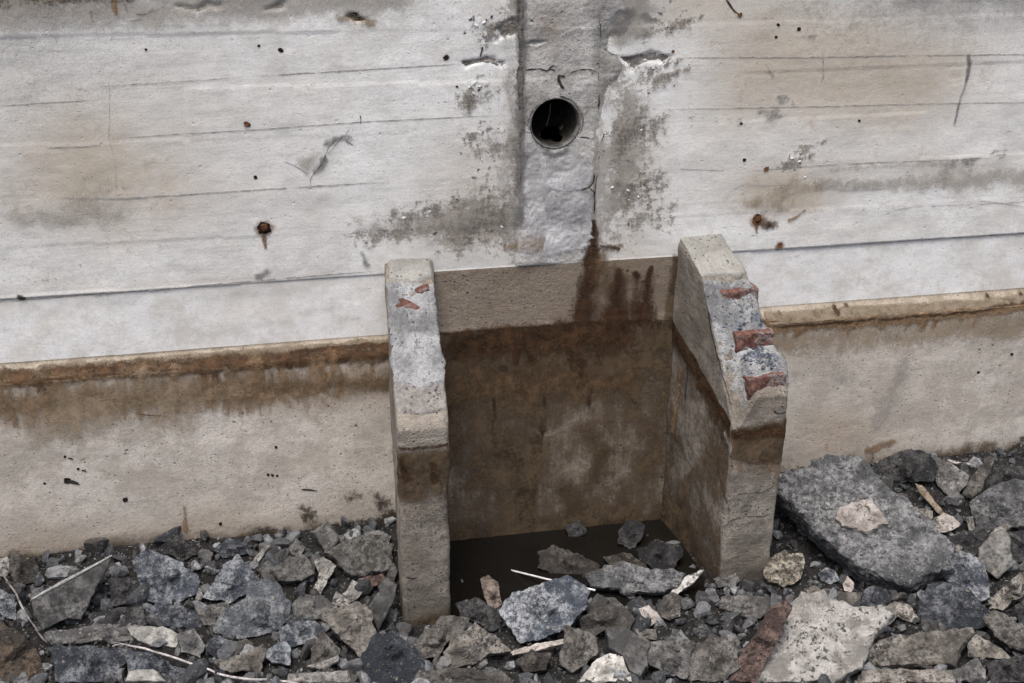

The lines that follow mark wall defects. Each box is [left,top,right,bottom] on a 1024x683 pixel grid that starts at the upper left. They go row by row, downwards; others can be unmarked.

peeling [597,52,690,238]
corrosion [751,215,778,229]
damp [0,343,390,439]
damp [346,255,787,578]
spalling [702,279,790,409]